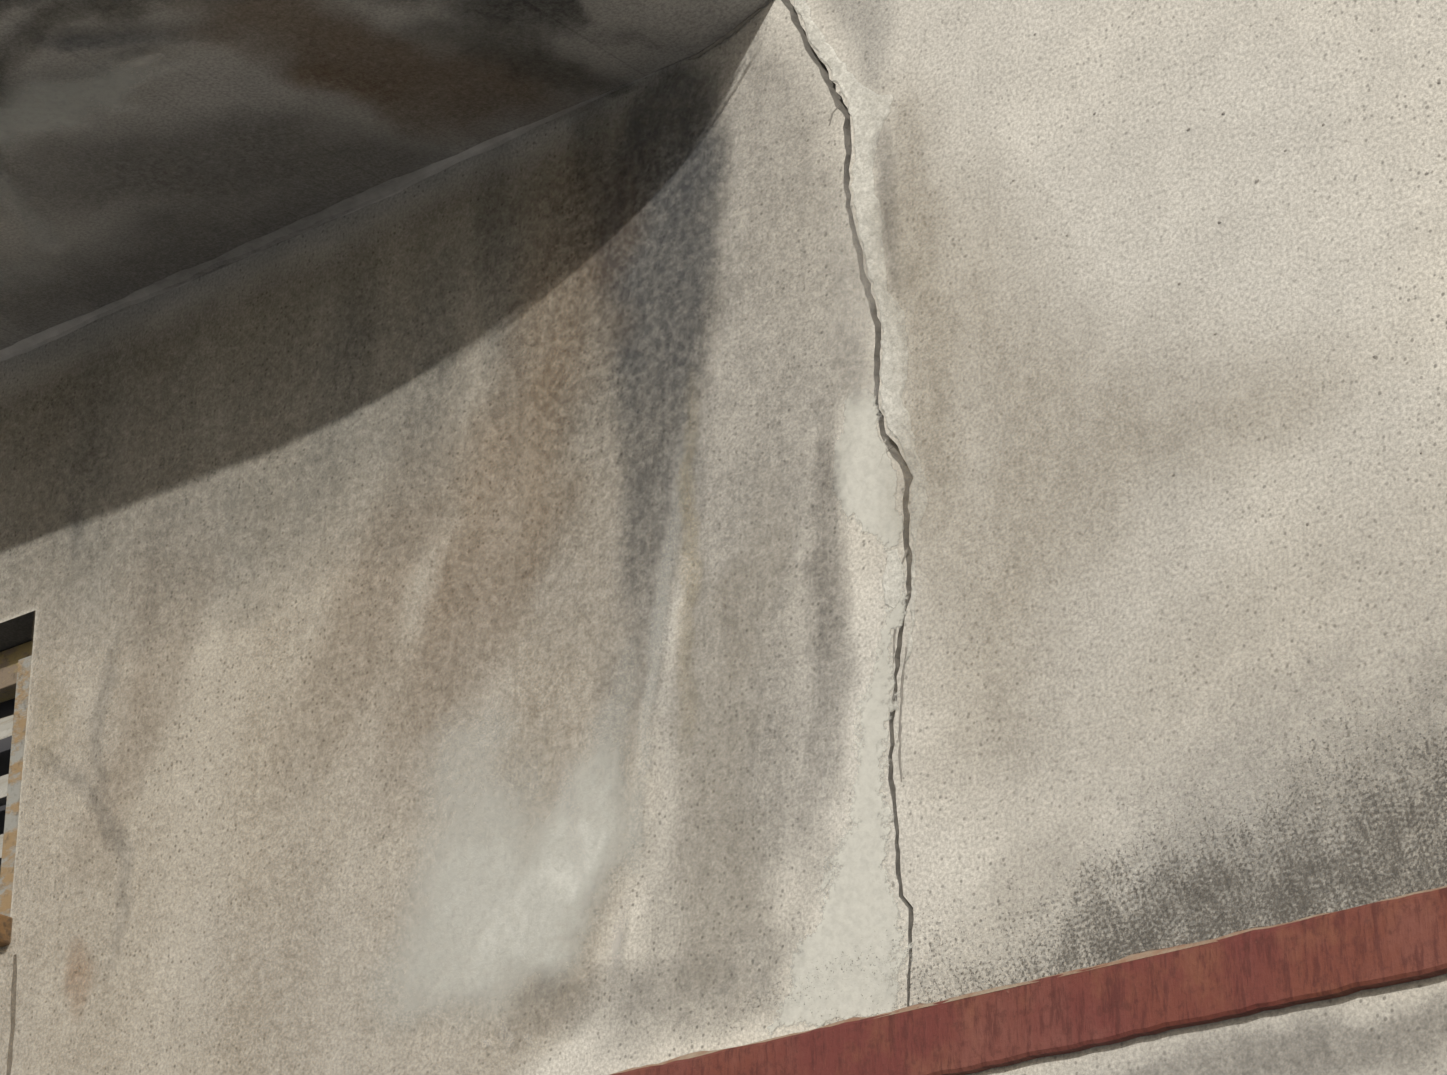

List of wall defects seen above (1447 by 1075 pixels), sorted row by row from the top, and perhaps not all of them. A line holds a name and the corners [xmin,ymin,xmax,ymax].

leakage [244,0,587,117]
crack [688,0,914,1007]
leakage [832,389,903,550]
leakage [745,563,1447,1035]